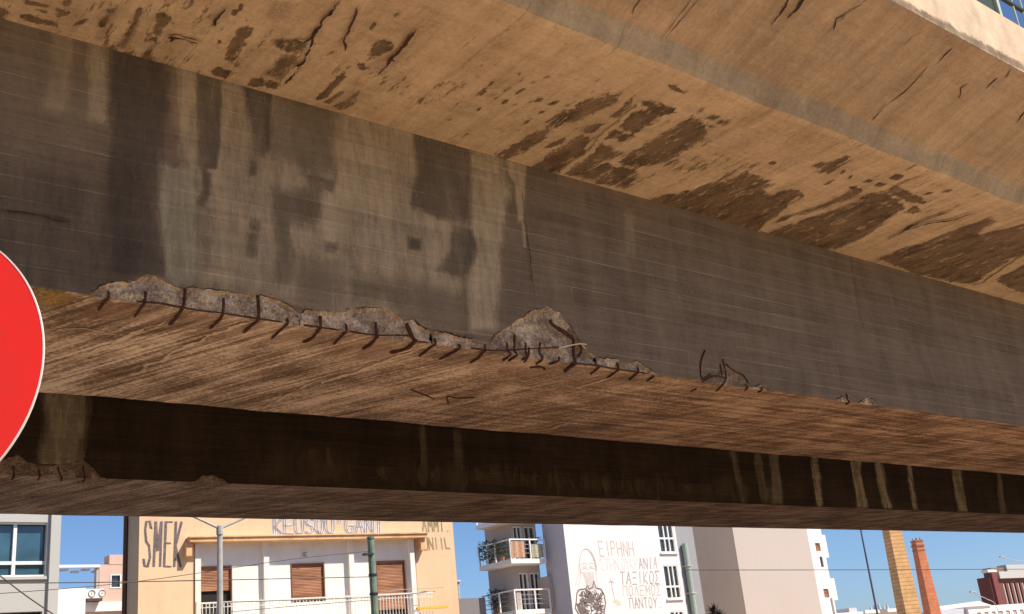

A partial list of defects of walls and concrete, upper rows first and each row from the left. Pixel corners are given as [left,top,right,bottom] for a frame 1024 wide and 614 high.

crack [168,9,227,46]
crack [284,1,361,85]
crack [378,30,418,77]
crack [872,49,952,121]
damp [0,44,526,331]
spalling [90,274,657,382]
spalling [690,350,769,393]